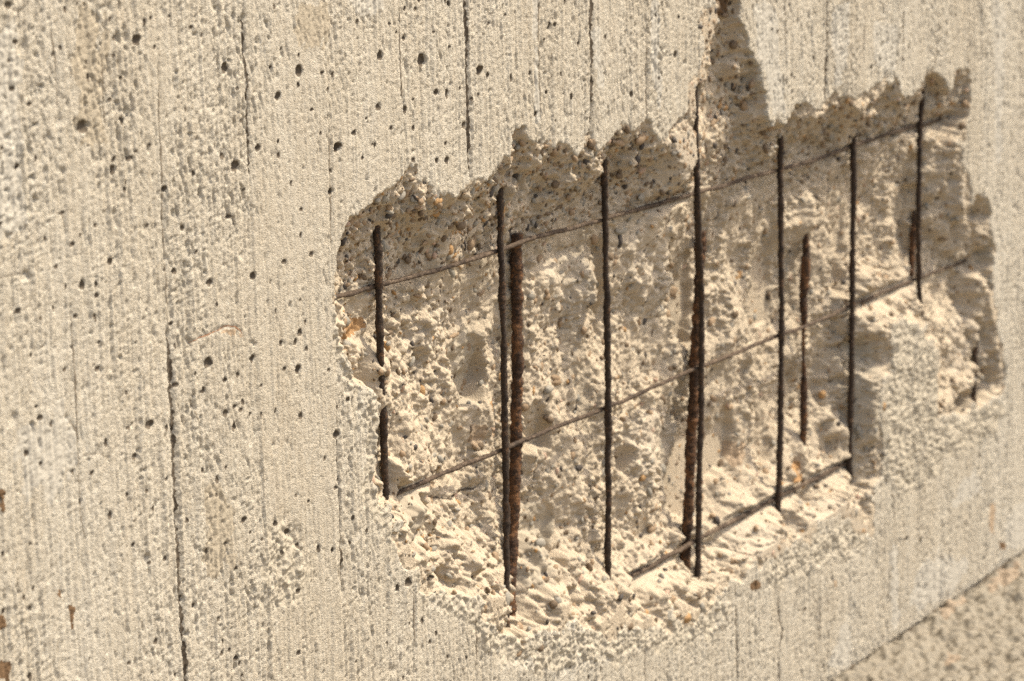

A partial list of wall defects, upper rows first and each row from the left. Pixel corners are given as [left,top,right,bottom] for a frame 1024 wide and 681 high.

crack [157,64,243,681]
spalling [332,0,1006,678]